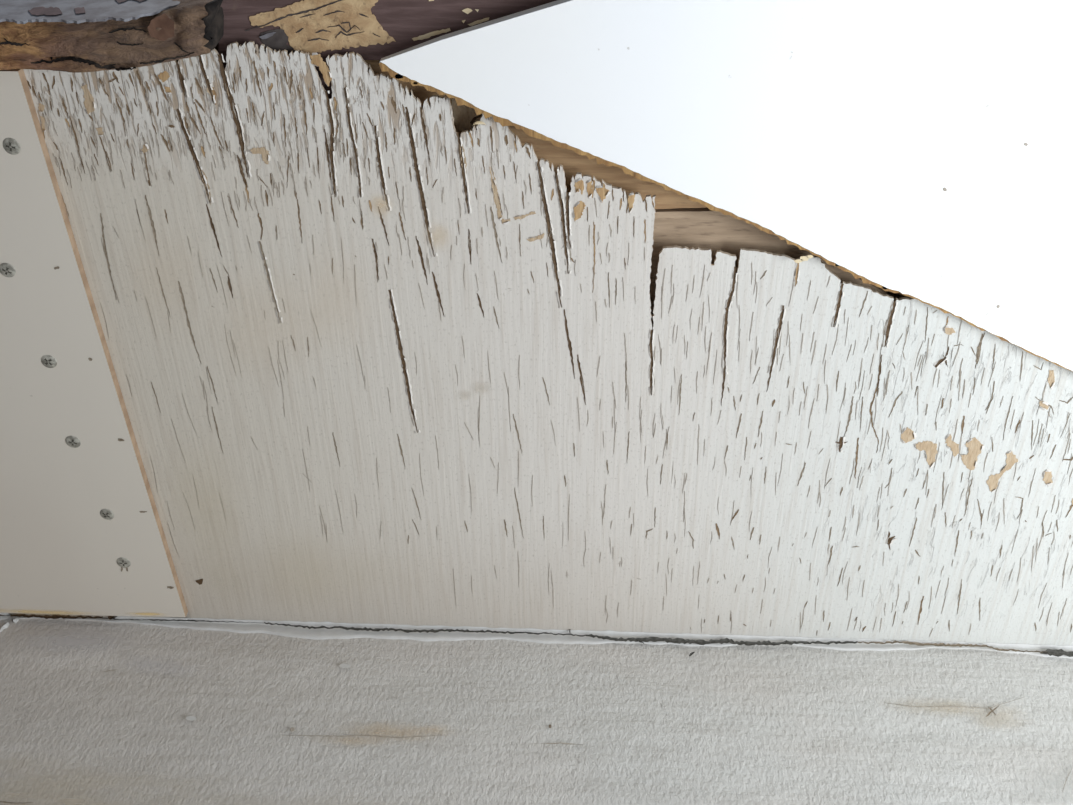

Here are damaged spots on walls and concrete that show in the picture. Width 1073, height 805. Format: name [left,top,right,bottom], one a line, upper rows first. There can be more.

peeling [0,0,180,24]
peeling [245,0,396,86]
peeling [81,82,96,114]
peeling [249,147,270,164]
peeling [491,180,536,225]
peeling [573,178,611,221]
crack [0,27,1073,657]
peeling [901,427,984,470]